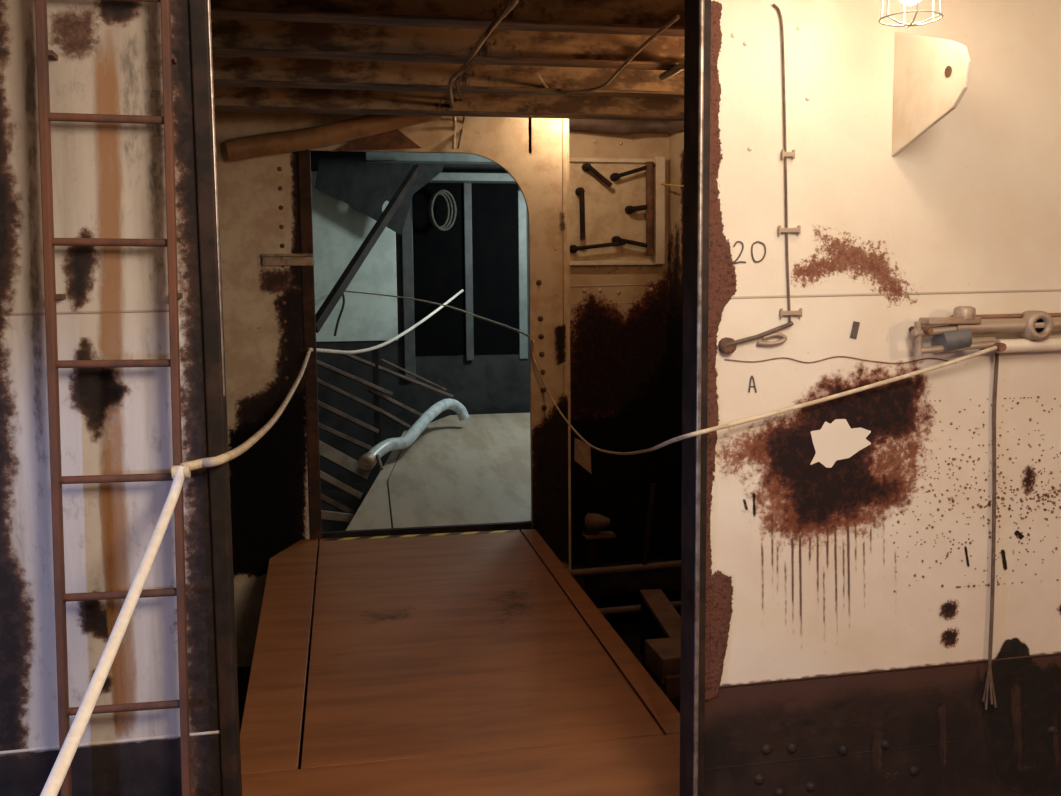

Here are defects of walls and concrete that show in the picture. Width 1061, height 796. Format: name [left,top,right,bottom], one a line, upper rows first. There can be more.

rust [0,0,33,756]
rust [52,0,141,732]
rust [160,0,222,796]
rust [532,151,684,571]
rust [705,0,737,701]
peeling [810,419,871,468]
rust [791,227,917,306]
rust [940,600,959,648]
rust [891,396,1061,588]